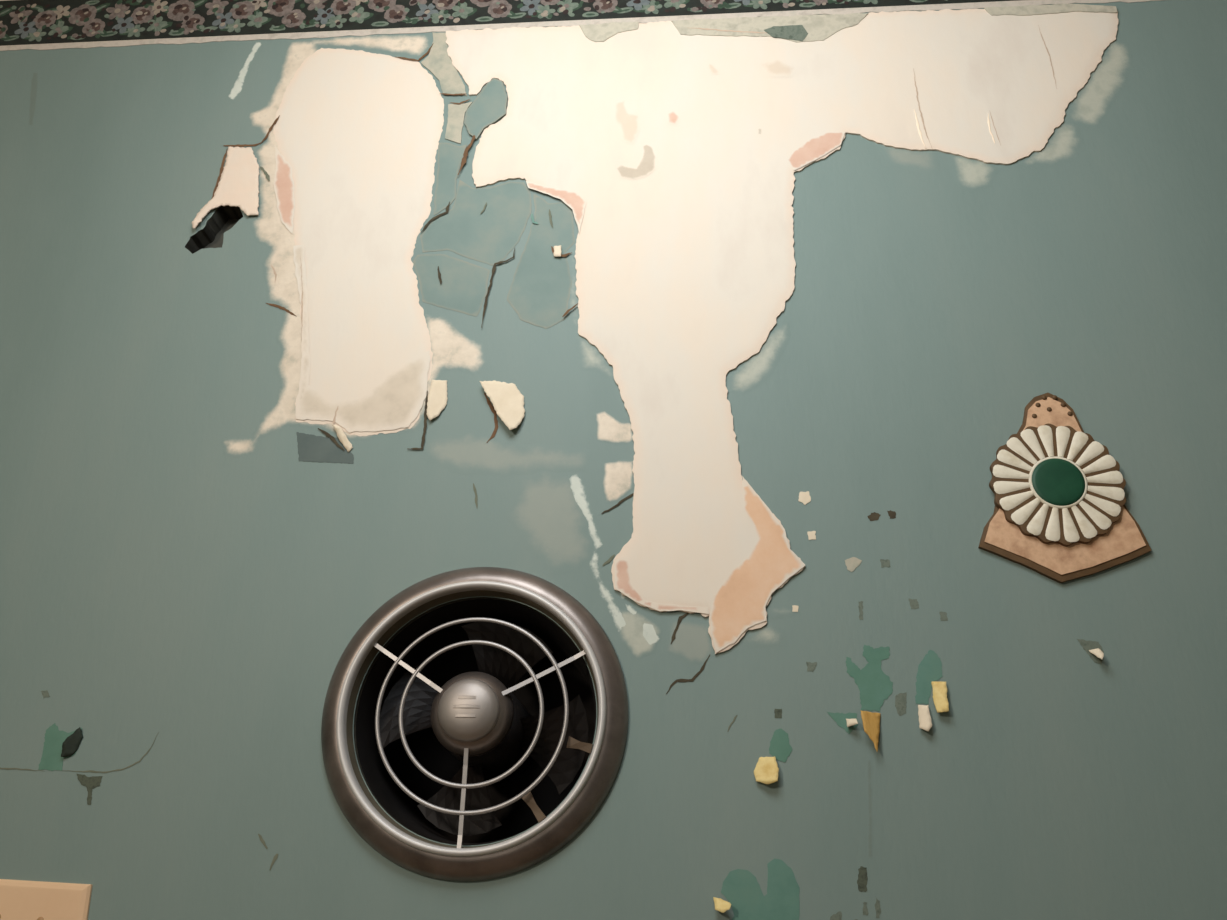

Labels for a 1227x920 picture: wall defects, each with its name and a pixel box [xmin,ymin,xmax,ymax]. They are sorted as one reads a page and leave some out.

peeling [185,4,1135,654]
crack [671,613,689,644]
crack [666,655,710,694]
peeling [827,644,949,752]
peeling [1077,639,1104,664]
peeling [38,723,83,771]
crack [0,732,159,773]
peeling [754,709,792,784]
peeling [77,774,103,805]
peeling [713,859,800,920]